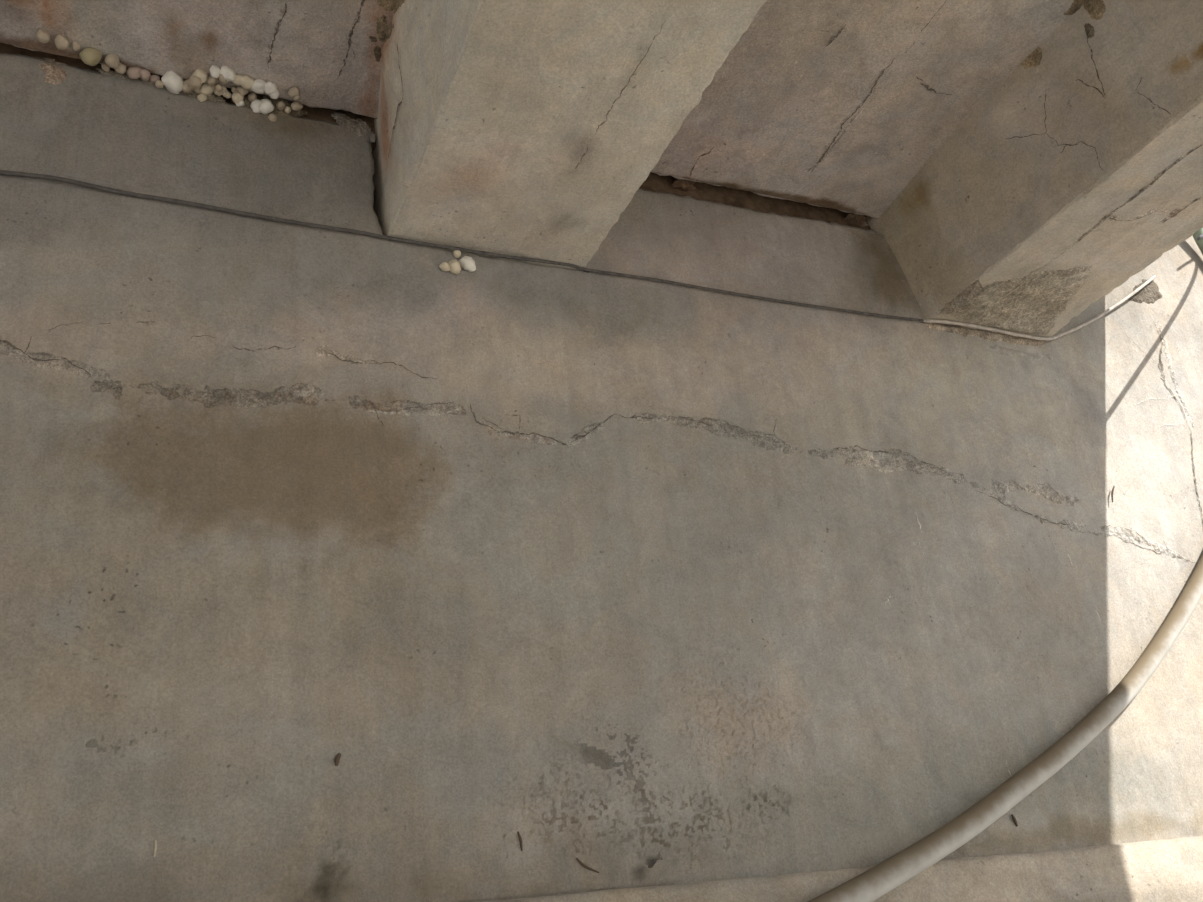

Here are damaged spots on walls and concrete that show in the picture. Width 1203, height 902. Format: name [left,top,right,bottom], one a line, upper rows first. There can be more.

water stain [155,1,227,69]
crack [266,3,287,63]
crack [338,0,366,77]
crack [576,21,666,168]
crack [805,1,952,172]
crack [1006,95,1103,170]
crack [1078,39,1105,97]
crack [1006,143,1203,294]
water stain [23,357,467,598]
crack [0,321,1203,564]